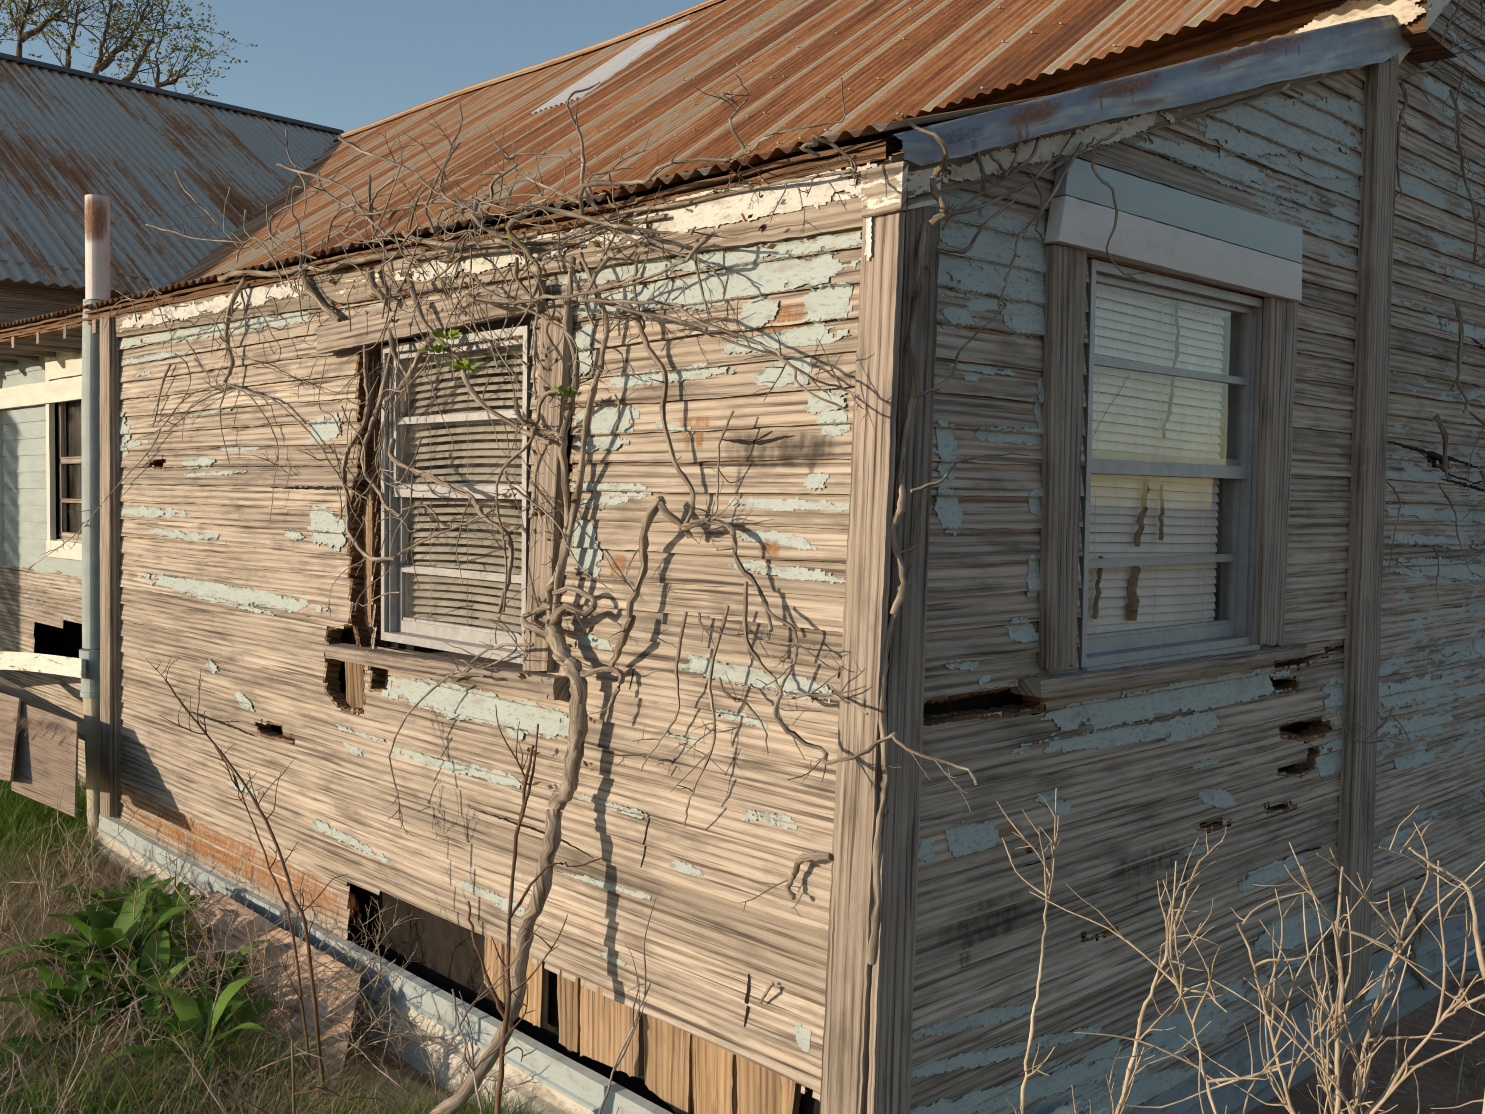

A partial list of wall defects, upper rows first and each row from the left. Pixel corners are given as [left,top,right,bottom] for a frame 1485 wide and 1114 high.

corrosion [1210,34,1306,71]
corrosion [1012,101,1060,142]
peeling [943,94,1365,207]
corrosion [85,199,107,240]
peeling [394,163,877,283]
peeling [118,281,317,377]
peeling [555,216,872,584]
crack [1387,441,1484,492]
peeling [138,572,329,616]
peeling [381,669,570,741]
peeling [678,655,832,703]
peeling [1011,660,1300,754]